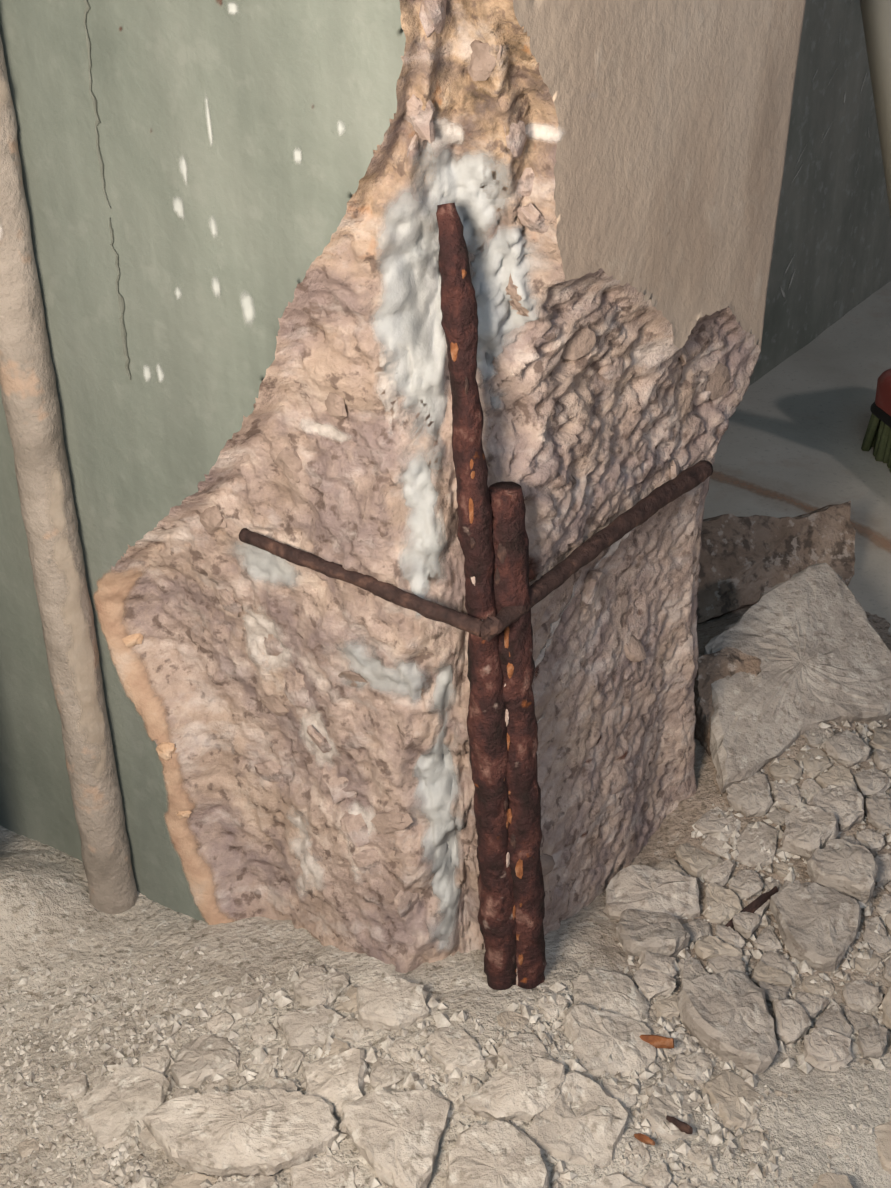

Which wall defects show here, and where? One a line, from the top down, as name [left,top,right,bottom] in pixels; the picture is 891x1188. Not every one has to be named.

rust [450,342,458,362]
spalling [94,0,761,973]
rust [504,626,514,687]
rust [506,809,523,920]